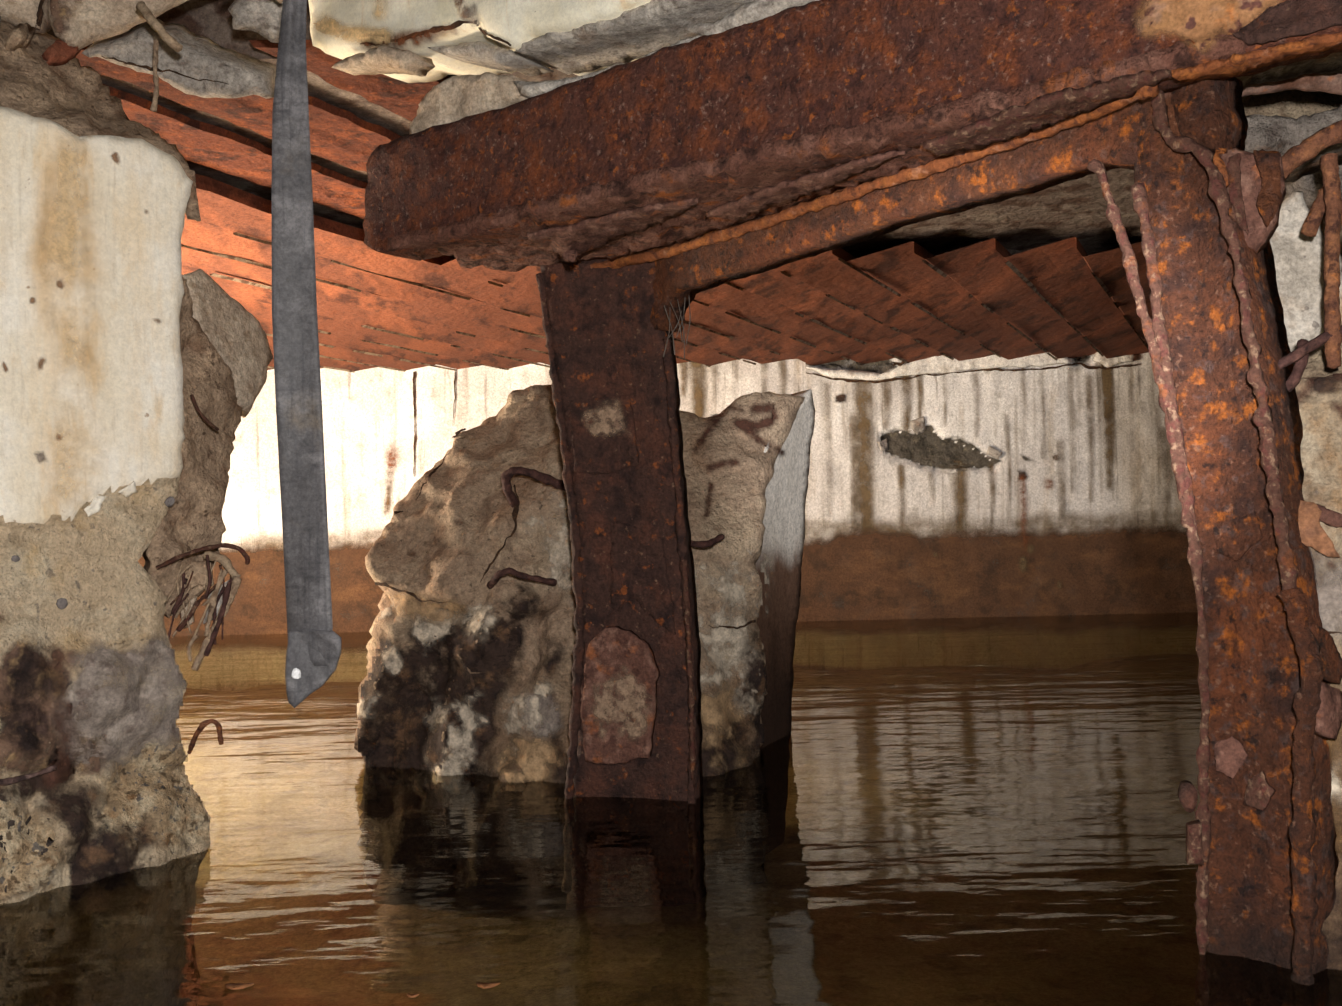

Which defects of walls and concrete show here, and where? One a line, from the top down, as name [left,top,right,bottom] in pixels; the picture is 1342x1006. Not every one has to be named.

rust [316,8,454,48]
spalling [1278,120,1342,392]
spalling [0,476,229,698]
leakage [0,539,288,901]
leakage [329,536,568,803]
spalling [877,416,1003,470]
leakage [797,364,1198,629]
spalling [0,748,210,1006]